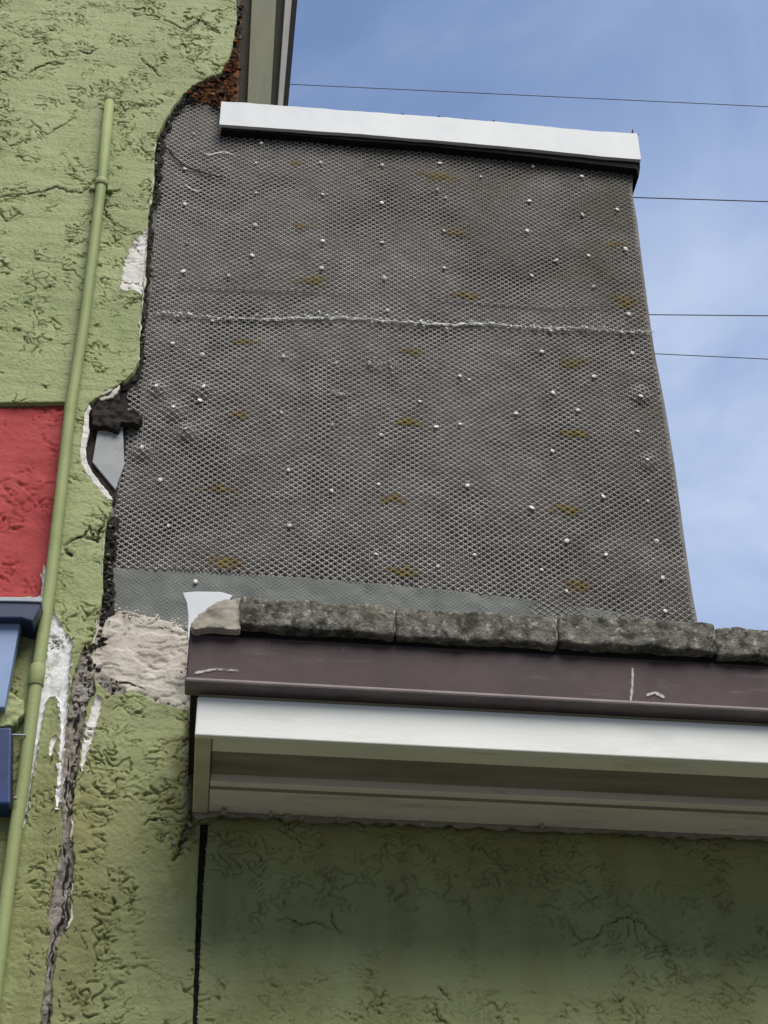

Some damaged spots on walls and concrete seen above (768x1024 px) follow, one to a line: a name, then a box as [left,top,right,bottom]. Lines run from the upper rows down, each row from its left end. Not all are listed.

corrosion [184,15,242,110]
spalling [80,5,246,711]
crack [28,648,126,1024]